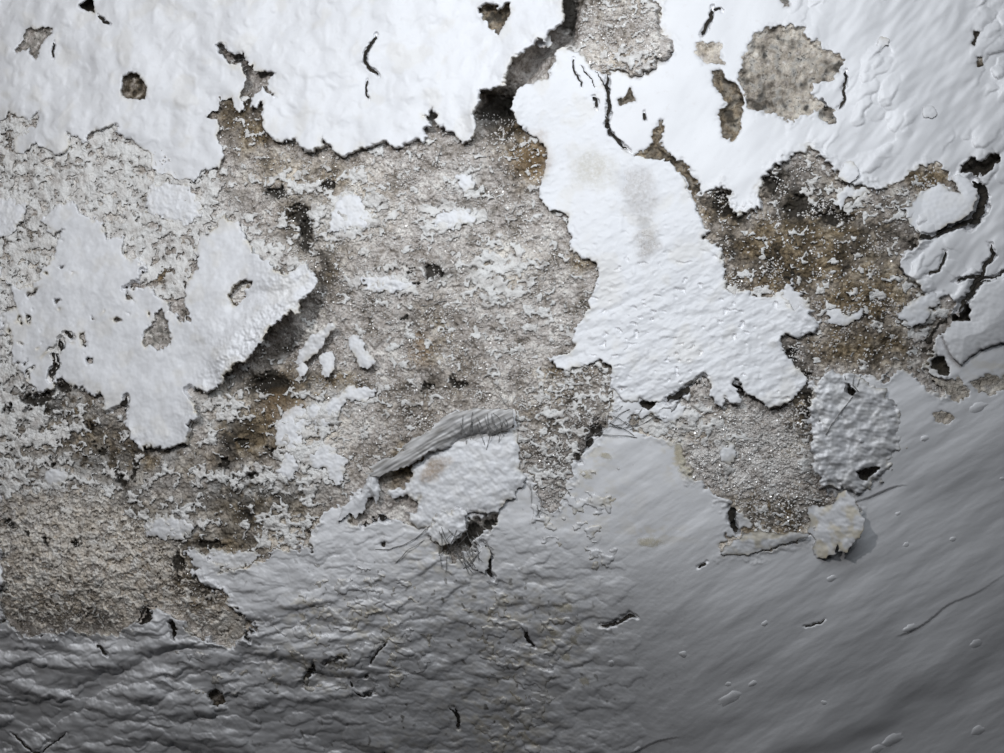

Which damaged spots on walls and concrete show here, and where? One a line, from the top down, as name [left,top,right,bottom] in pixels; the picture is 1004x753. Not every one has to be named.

spalling [0,0,618,648]
peeling [508,0,978,558]
peeling [970,373,1004,396]
peeling [270,566,435,700]
peeling [466,581,579,753]